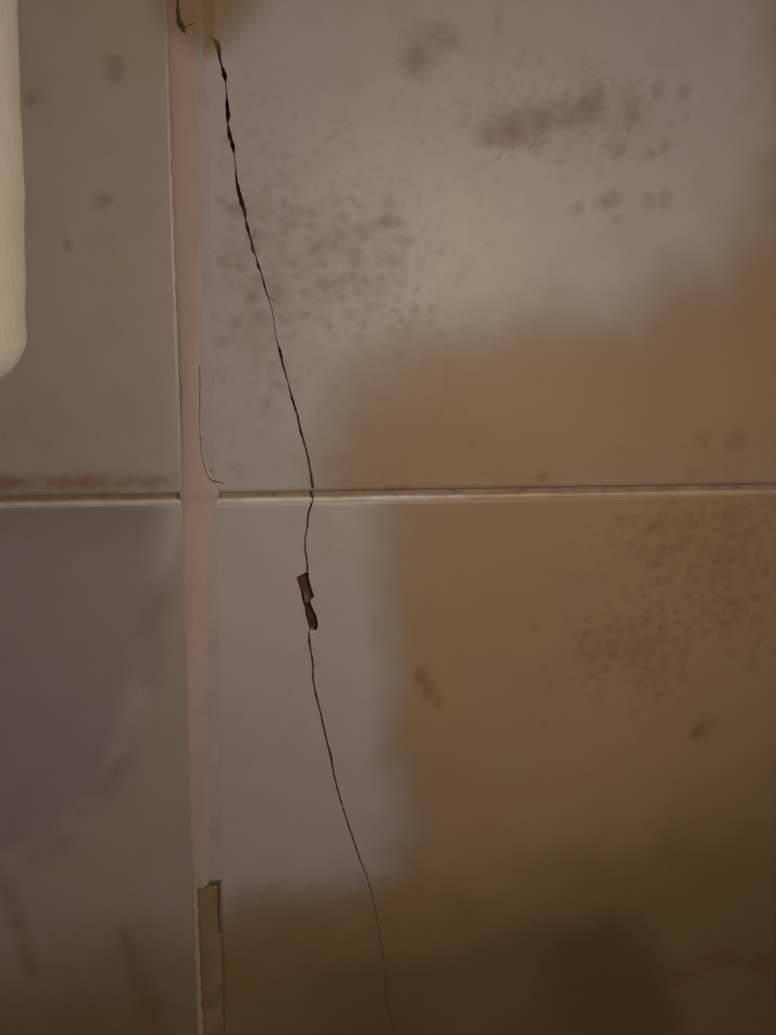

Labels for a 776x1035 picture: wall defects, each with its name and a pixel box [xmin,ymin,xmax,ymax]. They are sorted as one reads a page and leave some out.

crack [175,0,314,570]
crack [308,631,395,1035]
water stain [221,257,776,1035]